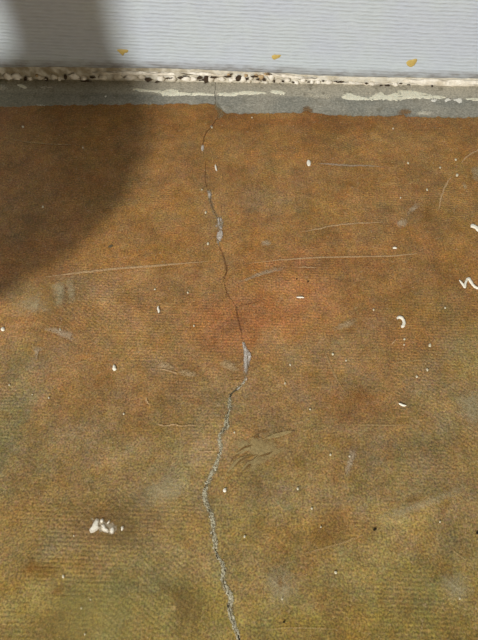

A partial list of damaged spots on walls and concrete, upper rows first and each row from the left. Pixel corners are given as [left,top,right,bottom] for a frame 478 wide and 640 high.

crack [202,369,247,640]